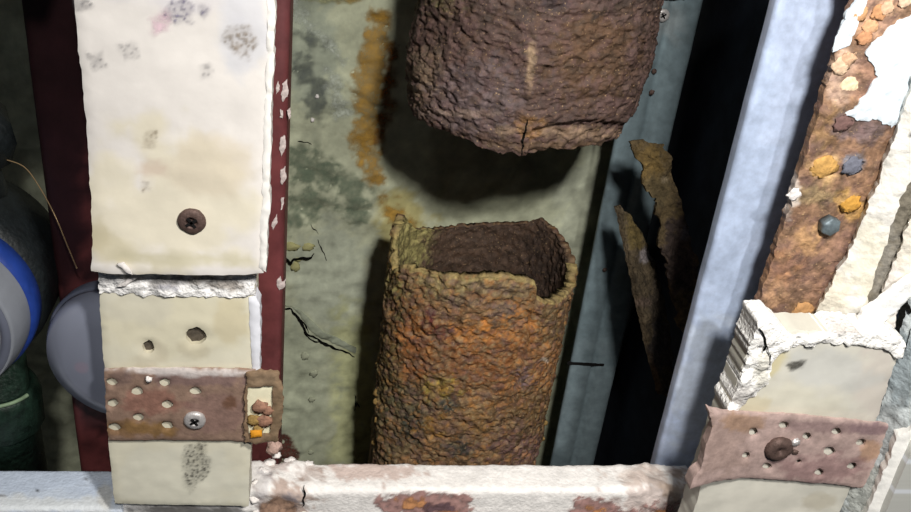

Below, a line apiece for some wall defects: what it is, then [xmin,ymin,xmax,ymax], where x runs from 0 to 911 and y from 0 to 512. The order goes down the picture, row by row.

corrosion [348,12,398,185]
spalling [98,262,257,298]
corrosion [614,139,699,397]
crack [285,305,357,357]
spalling [714,300,906,411]
corrosion [374,490,473,512]
corrosion [569,496,679,512]